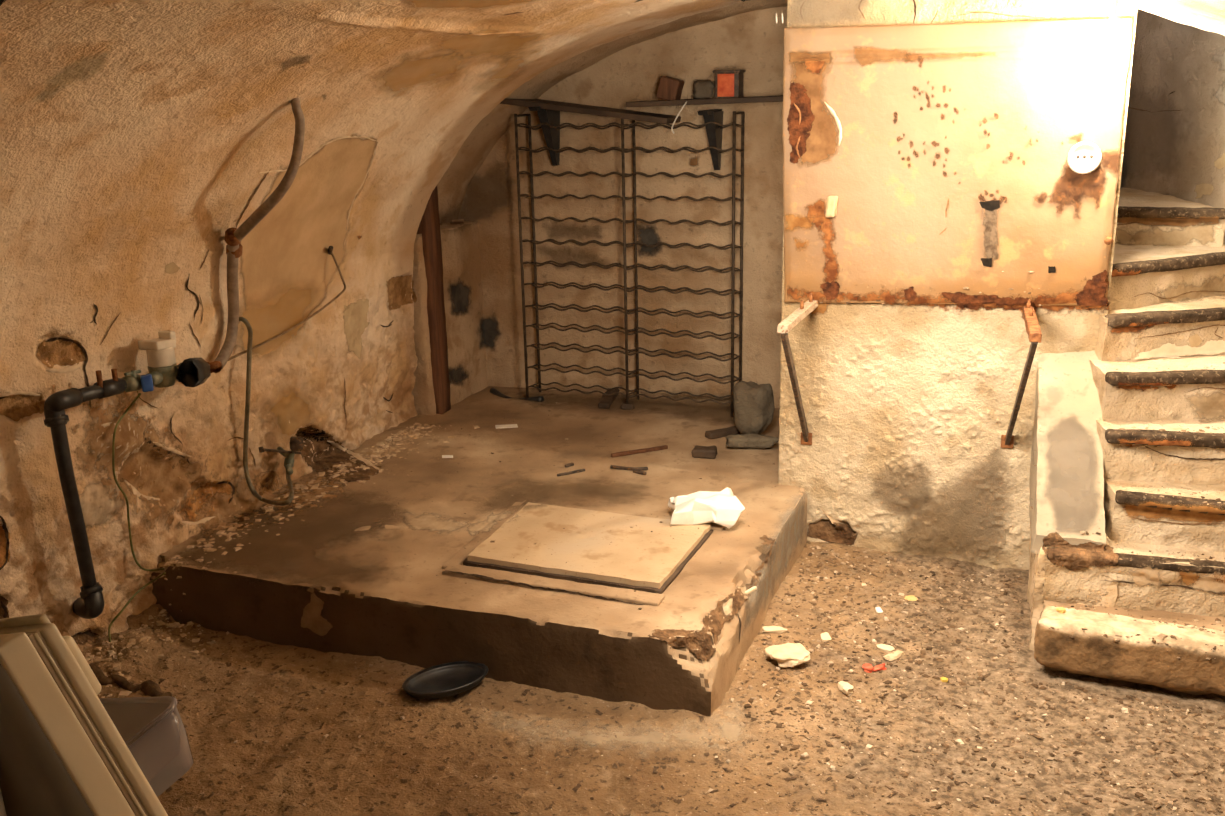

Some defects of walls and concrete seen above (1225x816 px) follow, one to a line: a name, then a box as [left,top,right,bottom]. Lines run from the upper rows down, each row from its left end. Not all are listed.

rust [787,52,842,164]
rust [1034,148,1120,217]
peeling [240,136,378,329]
damp [637,225,661,256]
rust [785,200,1142,319]
damp [448,281,471,315]
crack [1135,291,1225,299]
damp [480,317,501,350]
crack [1137,324,1225,339]
flaking render [36,337,87,373]
spalling [648,535,776,661]
crack [1103,580,1225,594]